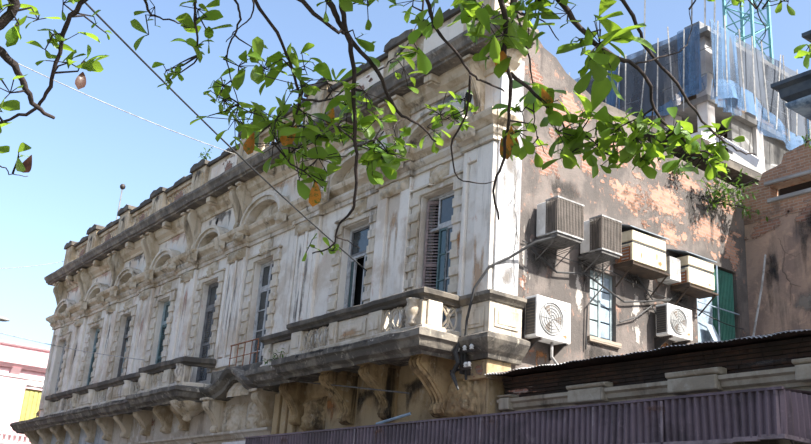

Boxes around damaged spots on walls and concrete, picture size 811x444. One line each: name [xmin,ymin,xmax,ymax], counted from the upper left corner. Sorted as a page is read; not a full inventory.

spalling [531,90,599,197]
spalling [573,143,811,271]
peeling [573,264,585,313]
peeling [631,282,643,344]
leakage [767,256,777,282]